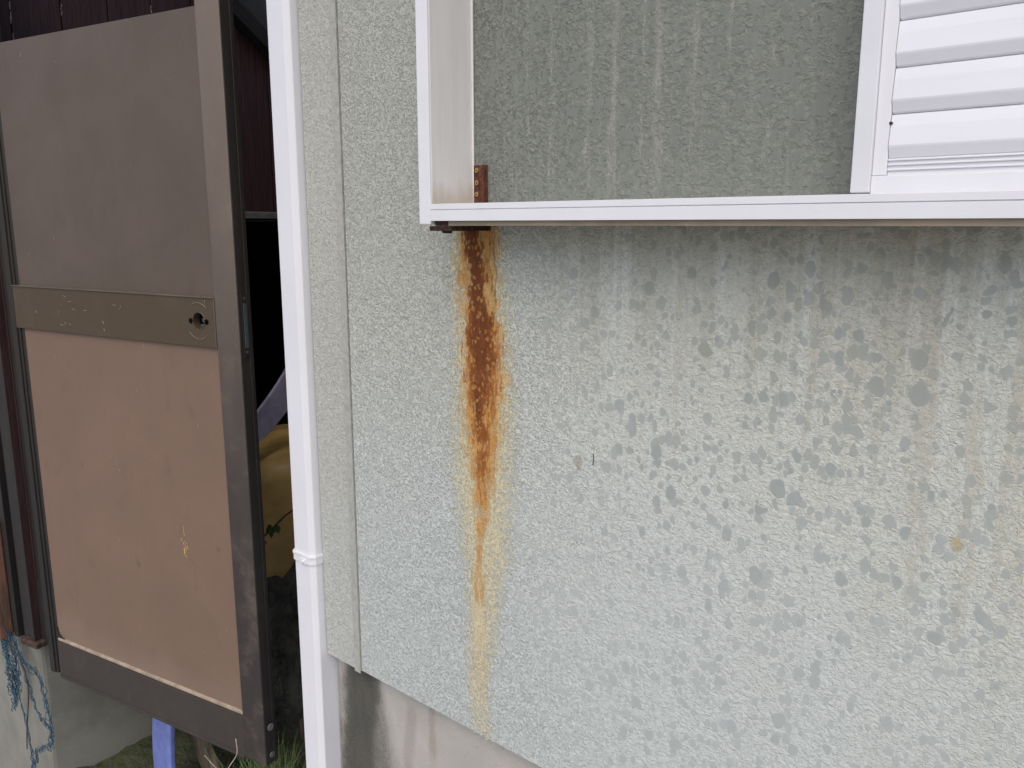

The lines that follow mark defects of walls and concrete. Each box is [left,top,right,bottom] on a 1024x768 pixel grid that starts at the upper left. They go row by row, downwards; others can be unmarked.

rust [430,221,523,742]